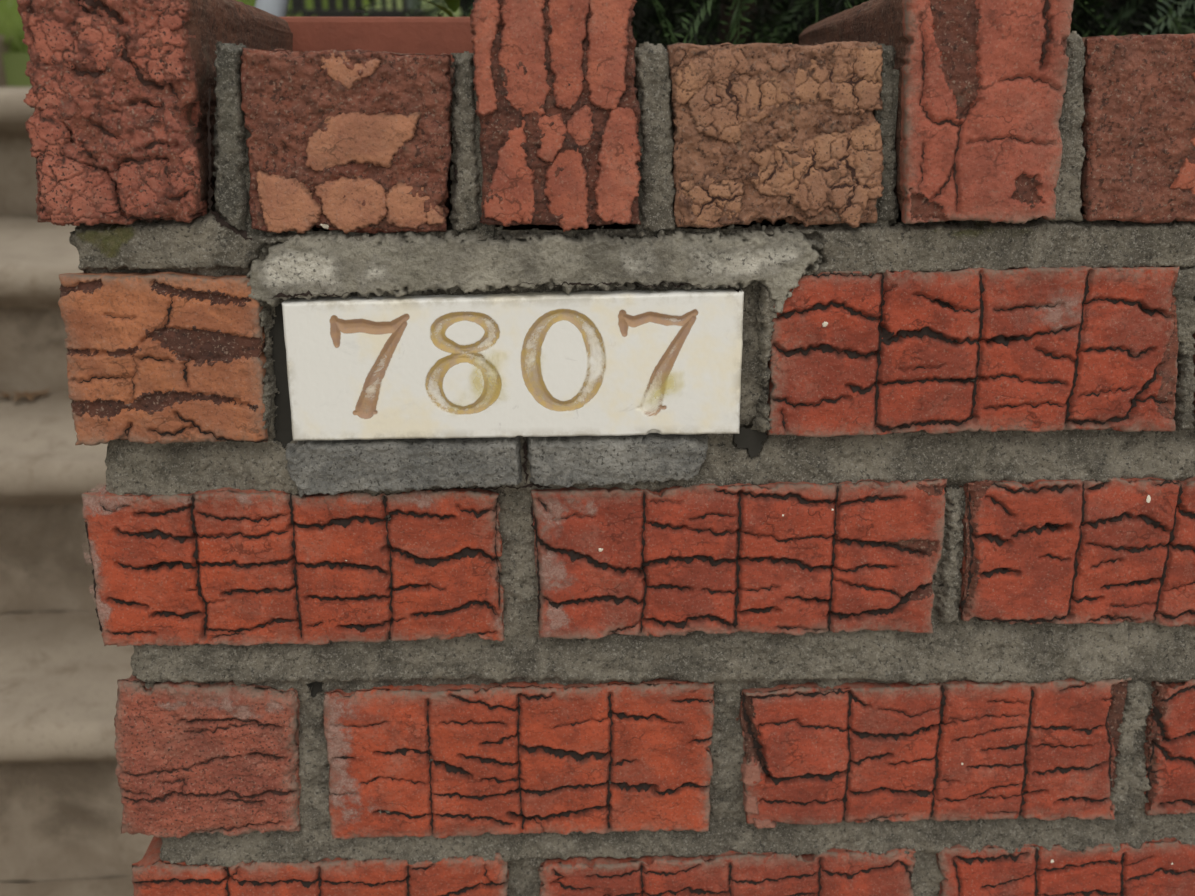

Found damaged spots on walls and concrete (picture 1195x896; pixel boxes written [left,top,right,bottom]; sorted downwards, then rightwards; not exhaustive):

spalling [17,0,207,226]
spalling [243,49,452,234]
spalling [470,0,642,232]
crack [703,72,762,120]
crack [682,138,878,217]
crack [829,54,877,110]
crack [918,16,1054,204]
crack [999,0,1058,90]
spalling [1082,38,1195,221]